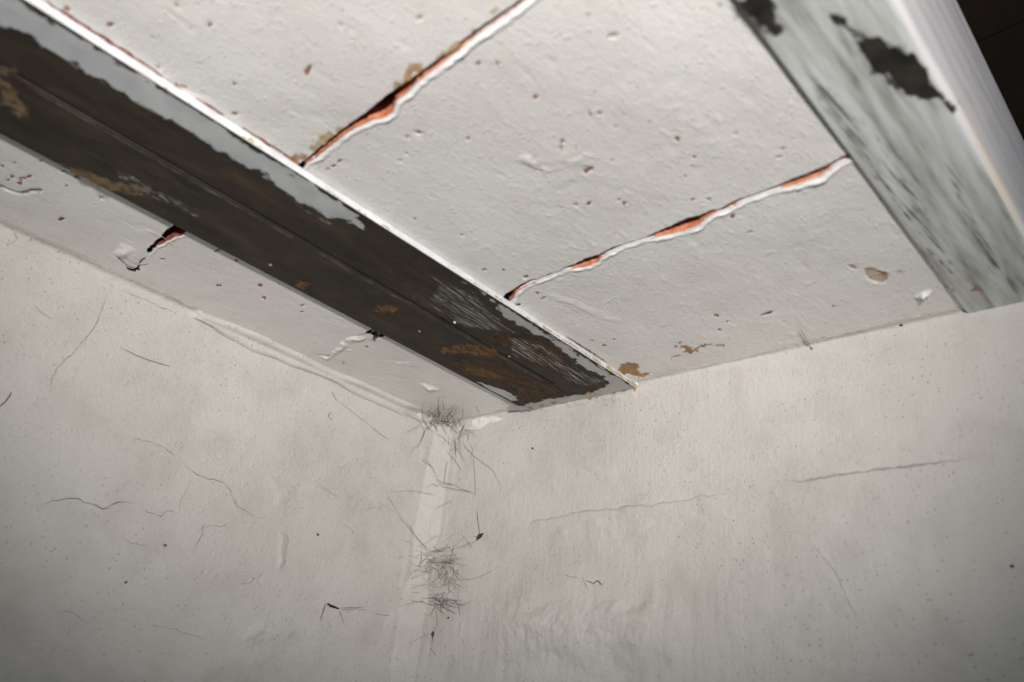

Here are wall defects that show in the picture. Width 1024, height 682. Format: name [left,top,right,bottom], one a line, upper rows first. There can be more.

peeling [734,0,784,36]
peeling [829,13,956,113]
peeling [0,162,42,193]
peeling [850,265,905,283]
crack [51,256,175,381]
peeling [477,382,517,401]
crack [46,439,261,547]